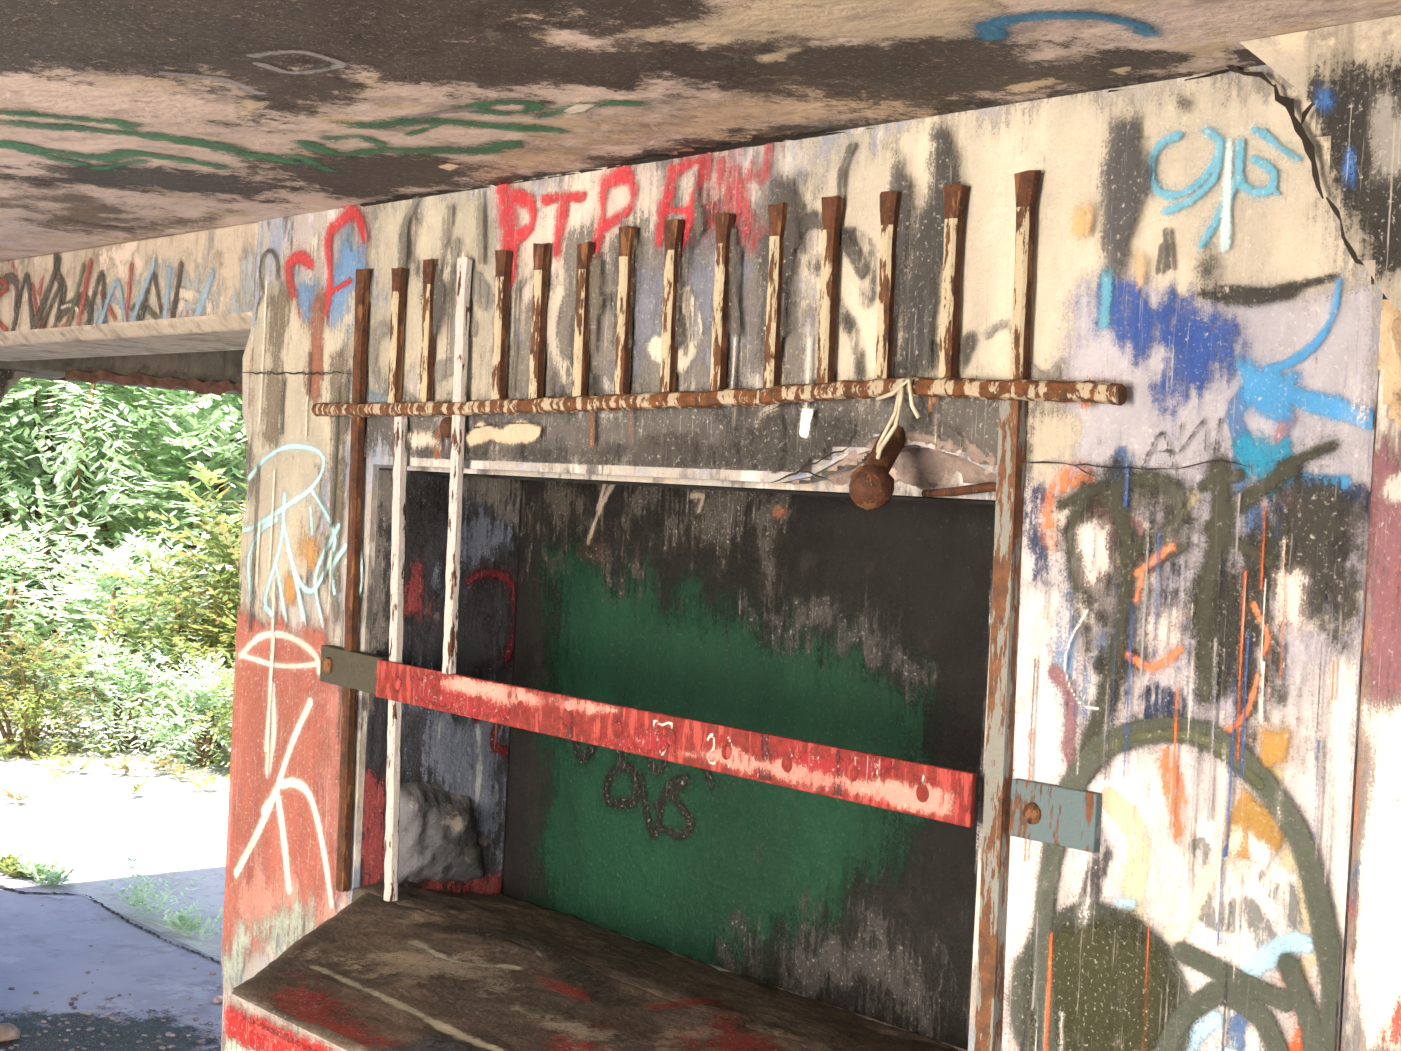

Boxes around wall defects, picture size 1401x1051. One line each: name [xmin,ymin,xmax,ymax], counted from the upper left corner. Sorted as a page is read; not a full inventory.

crack [360,128,874,207]
corrosion [1070,204,1093,240]
corrosion [1135,254,1145,286]
crack [1184,65,1374,285]
spalling [1378,299,1401,426]
peeling [371,470,521,681]
peeling [361,769,386,886]
peeling [402,703,509,895]
peeling [260,919,790,1051]